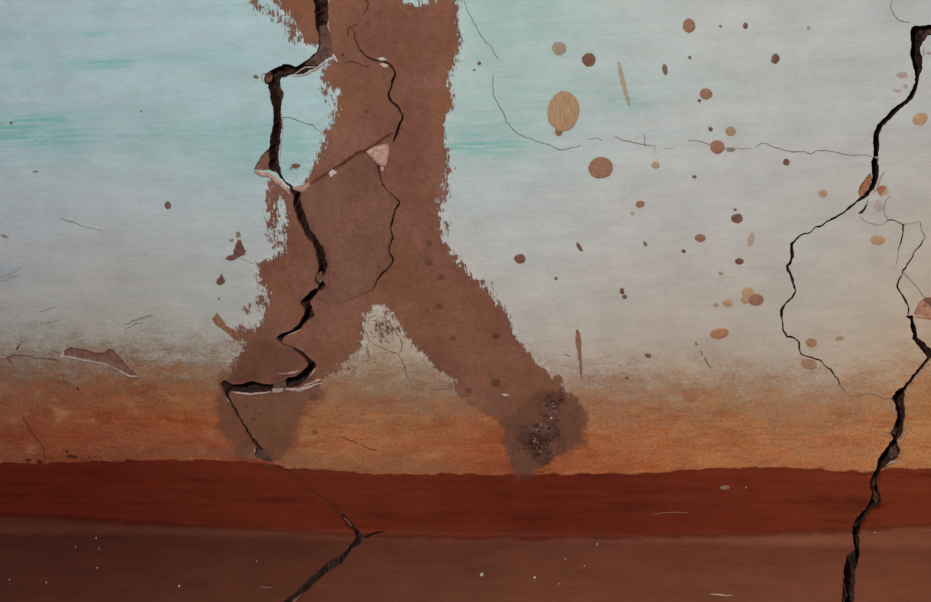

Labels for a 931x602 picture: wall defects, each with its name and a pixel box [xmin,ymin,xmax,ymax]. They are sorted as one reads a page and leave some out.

crack [460,0,652,150]
flaking render [0,344,138,377]
crack [221,0,403,602]
corrosion [0,347,931,476]
crack [689,2,931,602]
flaking render [914,297,931,320]